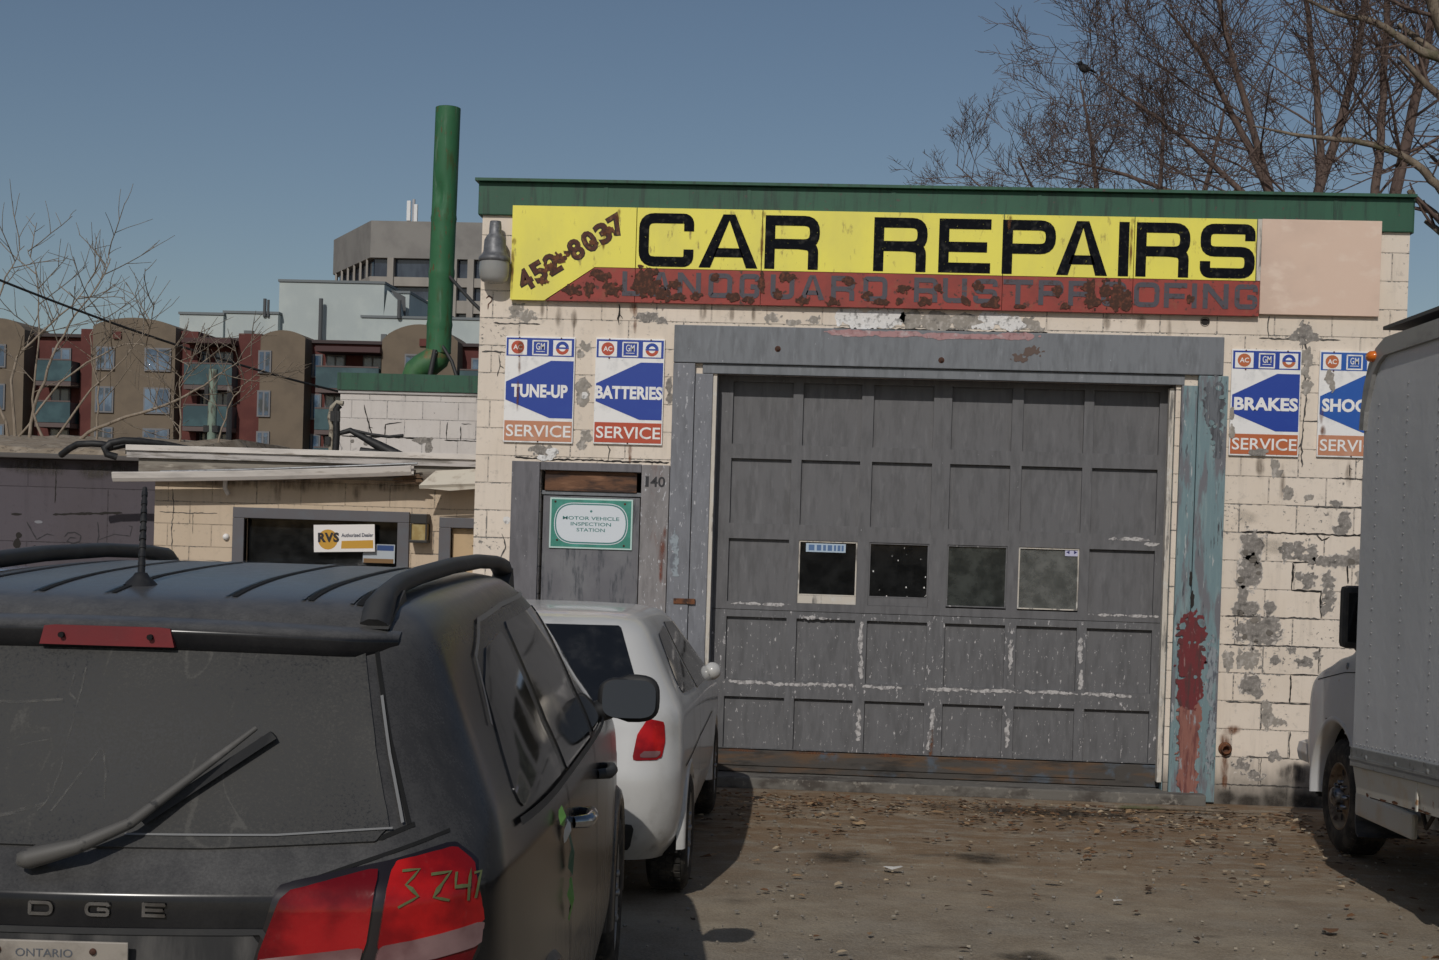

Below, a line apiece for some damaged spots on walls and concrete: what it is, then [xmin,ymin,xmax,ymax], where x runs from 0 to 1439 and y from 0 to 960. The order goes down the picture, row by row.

corrosion [588,211,620,247]
corrosion [538,250,720,327]
corrosion [726,240,943,308]
corrosion [961,280,1027,308]
peeling [764,308,1045,363]
peeling [1201,375,1235,459]
peeling [1174,448,1360,793]